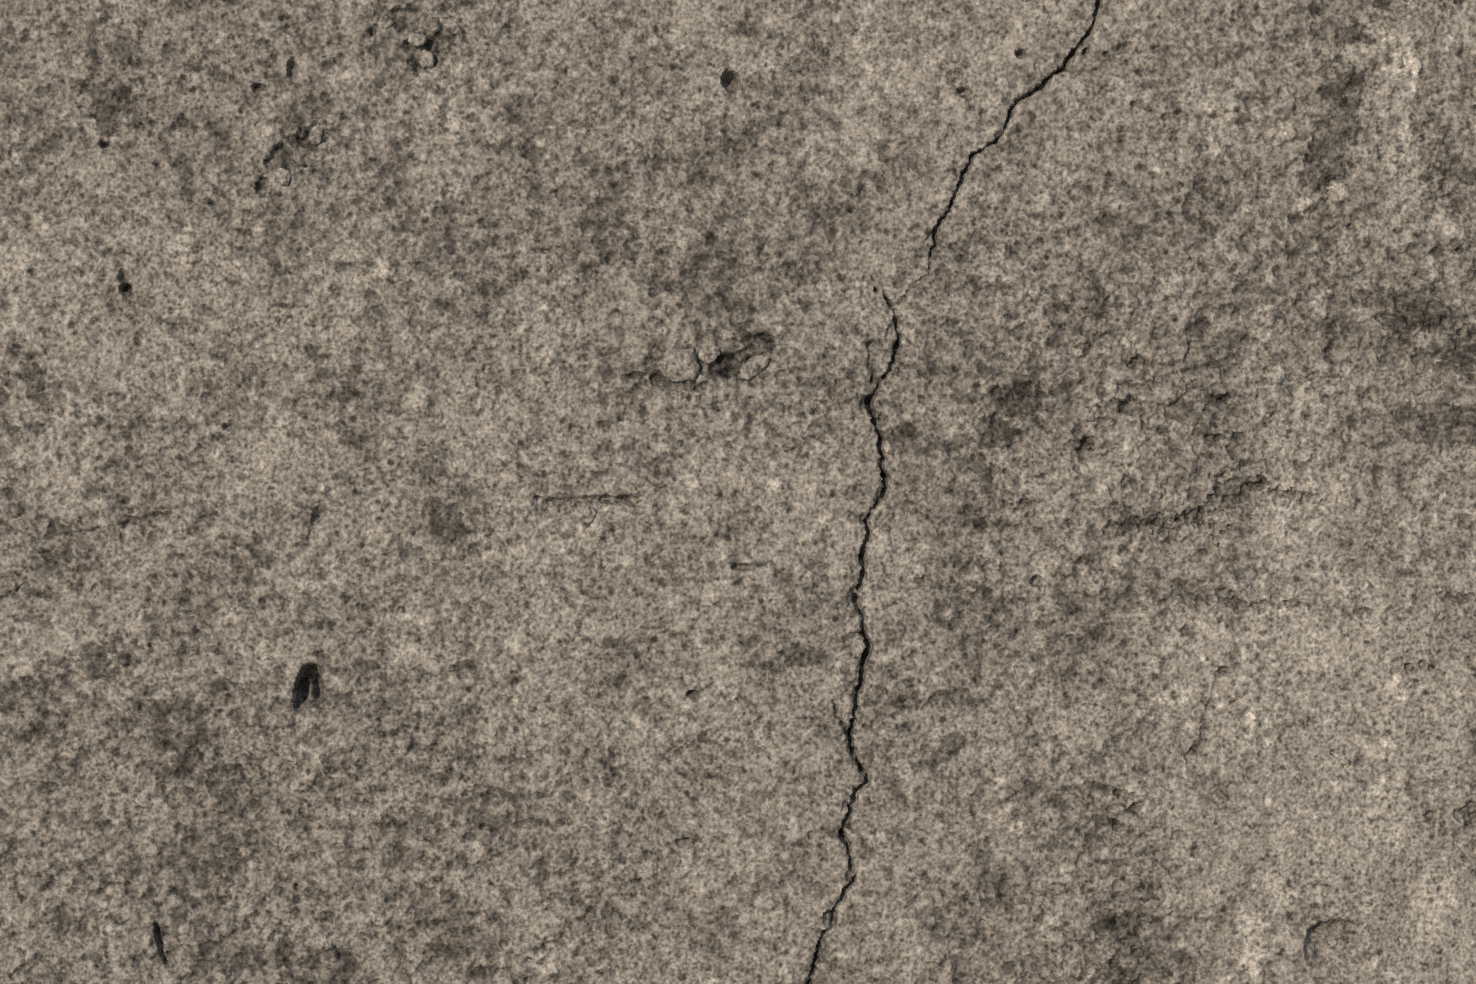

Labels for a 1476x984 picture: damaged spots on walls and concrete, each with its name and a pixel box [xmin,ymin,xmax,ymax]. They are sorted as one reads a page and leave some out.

crack [806,0,1103,984]